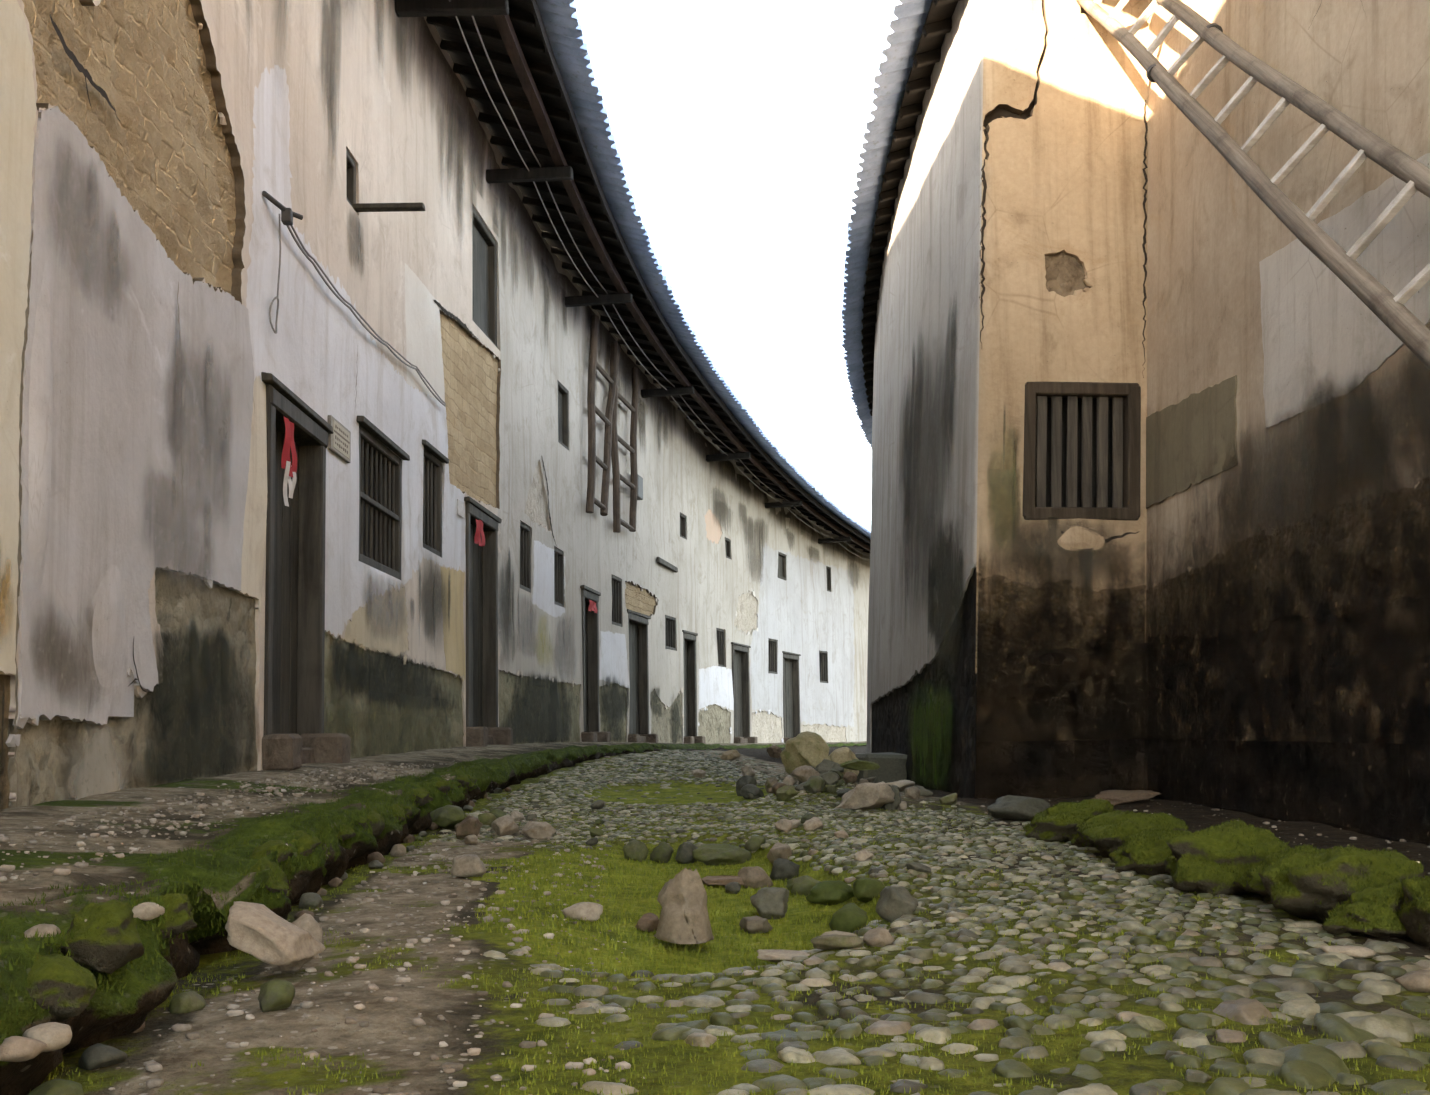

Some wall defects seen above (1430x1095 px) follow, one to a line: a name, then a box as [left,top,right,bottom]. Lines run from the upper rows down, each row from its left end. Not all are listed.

flaking render [22,0,236,295]
crack [979,34,1046,343]
flaking render [1045,251,1097,298]
crack [1141,100,1149,378]
flaking render [440,314,500,508]
flaking render [0,568,258,809]
leakage [333,641,450,709]
leakage [369,564,450,632]
leakage [503,675,571,744]
leakage [601,678,629,741]
leakage [650,689,682,743]
leakage [899,318,1430,846]